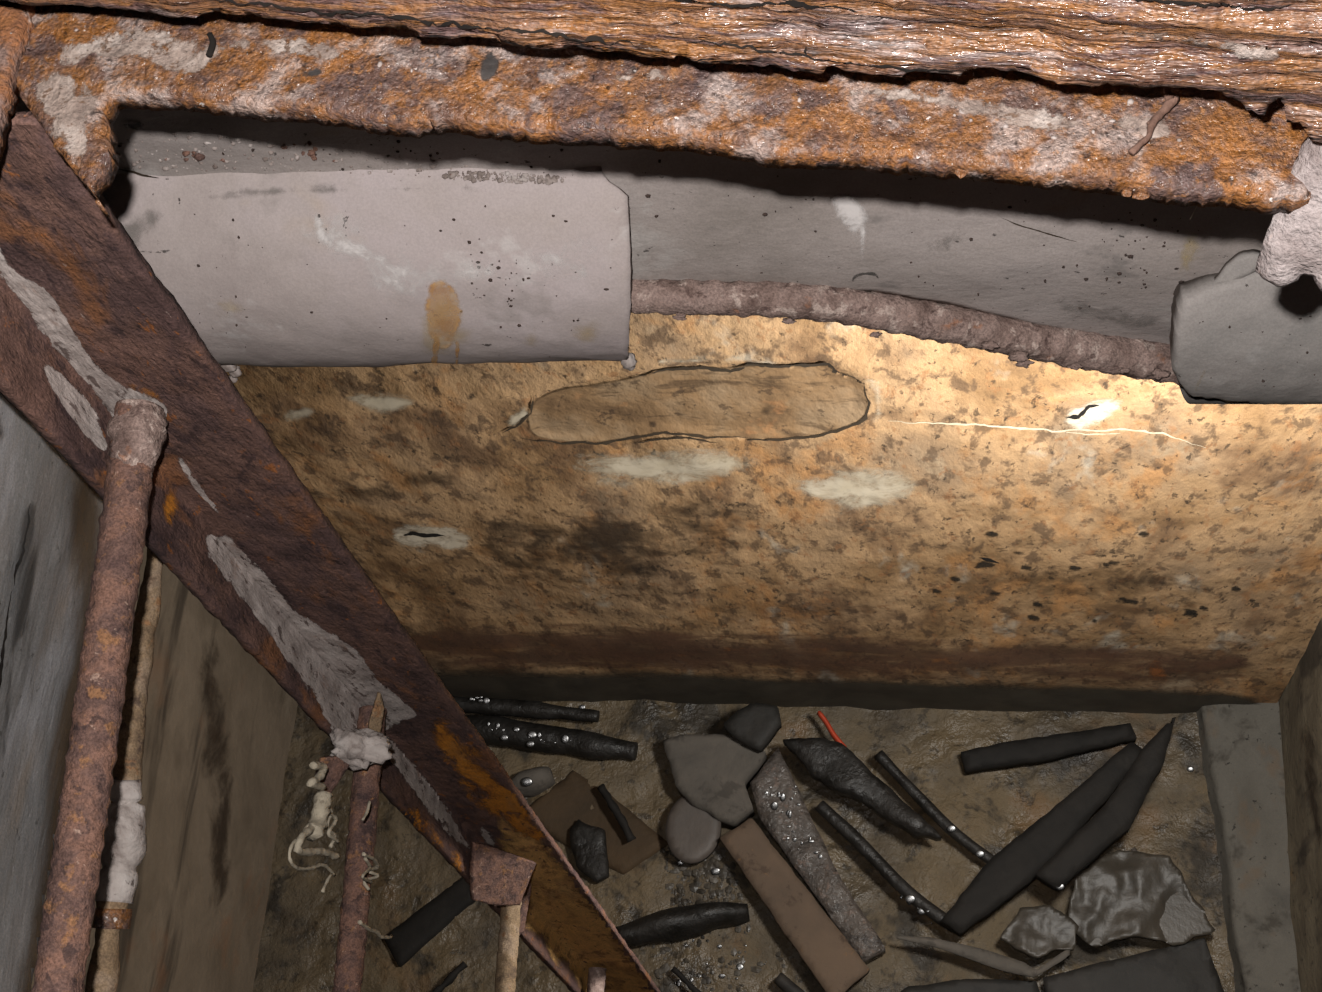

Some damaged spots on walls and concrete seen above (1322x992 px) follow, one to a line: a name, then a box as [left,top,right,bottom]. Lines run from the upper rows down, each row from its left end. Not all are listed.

corrosion [1121,188,1150,200]